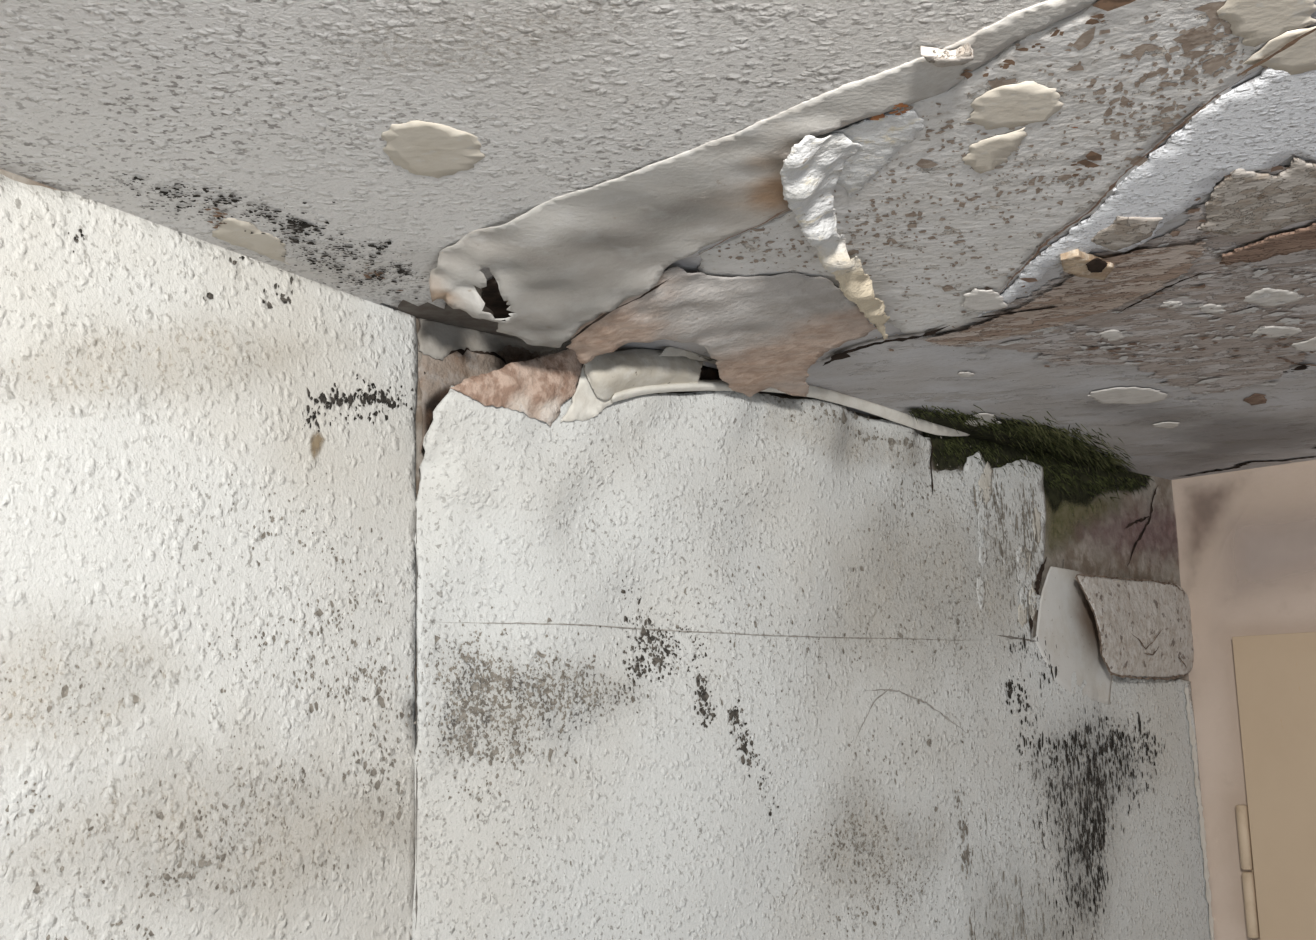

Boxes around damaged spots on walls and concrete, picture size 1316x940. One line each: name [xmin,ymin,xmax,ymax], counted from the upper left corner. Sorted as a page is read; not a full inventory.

peeling [381,120,485,179]
water stain [88,173,424,308]
peeling [697,211,840,288]
peeling [832,0,1316,405]
water stain [301,374,450,456]
flaking render [417,318,564,453]
peeling [966,413,1002,426]
water stain [22,658,106,724]
water stain [83,401,1006,940]
water stain [5,780,62,835]
water stain [1001,621,1172,938]